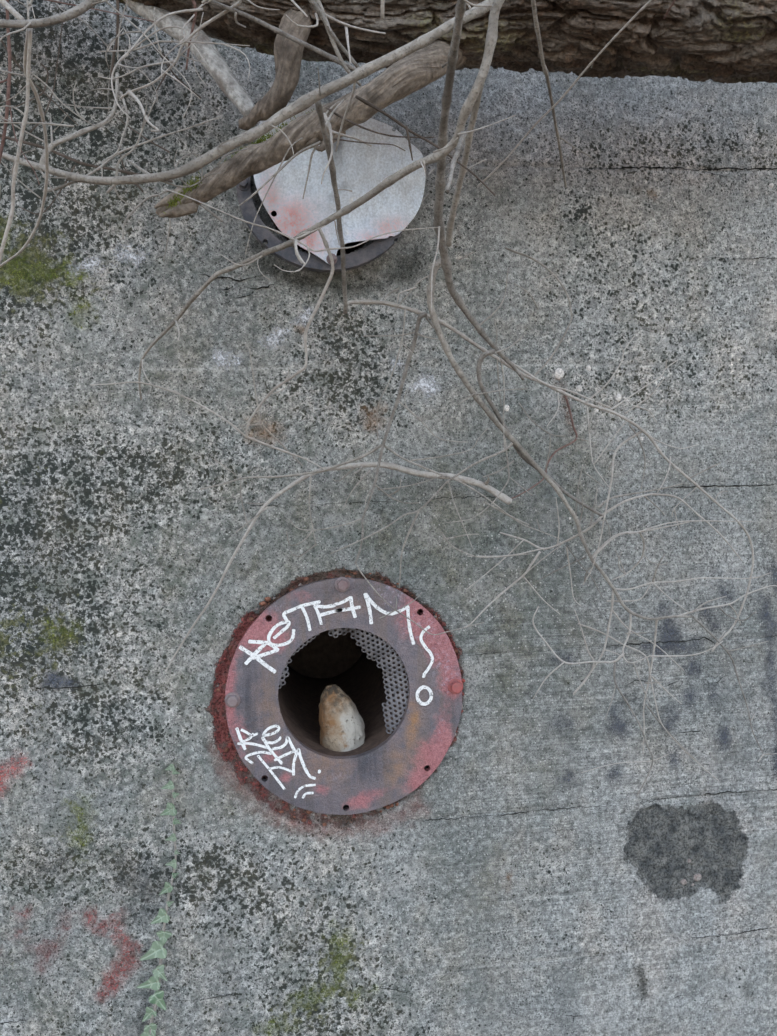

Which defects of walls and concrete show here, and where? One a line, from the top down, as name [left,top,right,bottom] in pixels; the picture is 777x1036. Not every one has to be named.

crack [580,166,777,177]
crack [674,482,774,490]
crack [425,789,777,821]